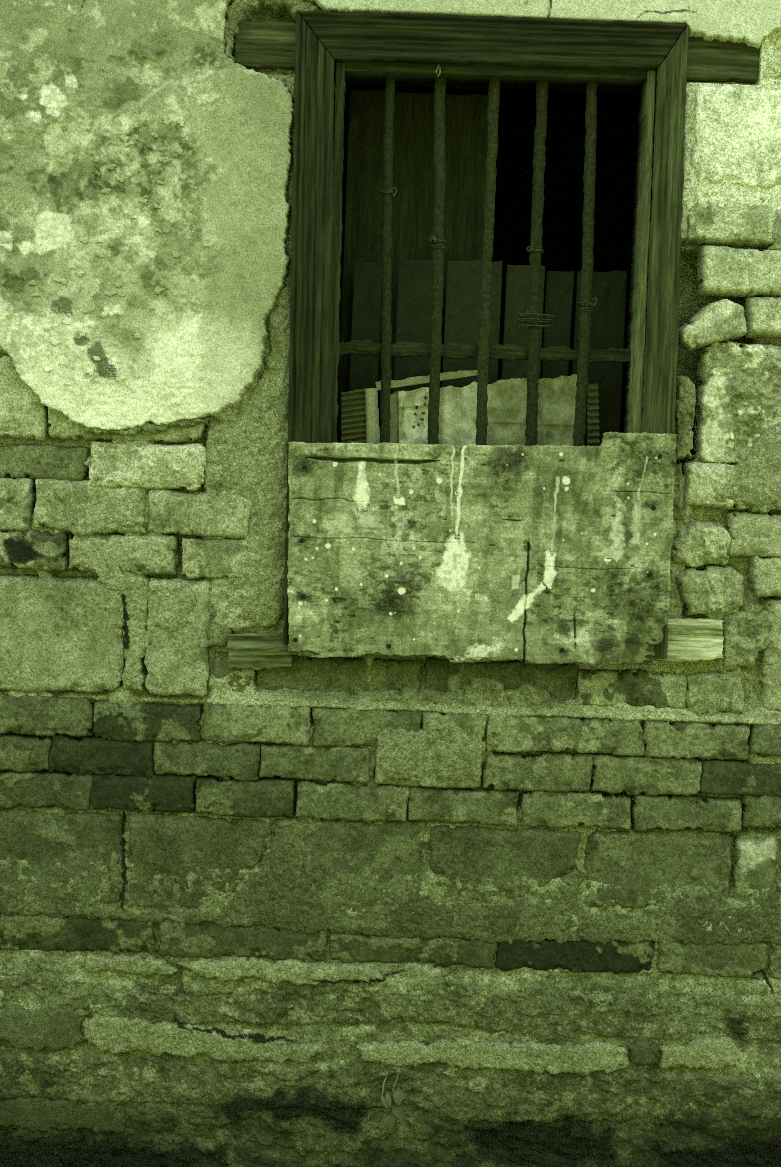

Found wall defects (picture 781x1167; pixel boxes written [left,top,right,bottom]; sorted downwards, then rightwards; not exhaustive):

spalling [223,0,321,63]
peeling [131,119,186,218]
spalling [678,299,747,351]
spalling [671,519,774,717]